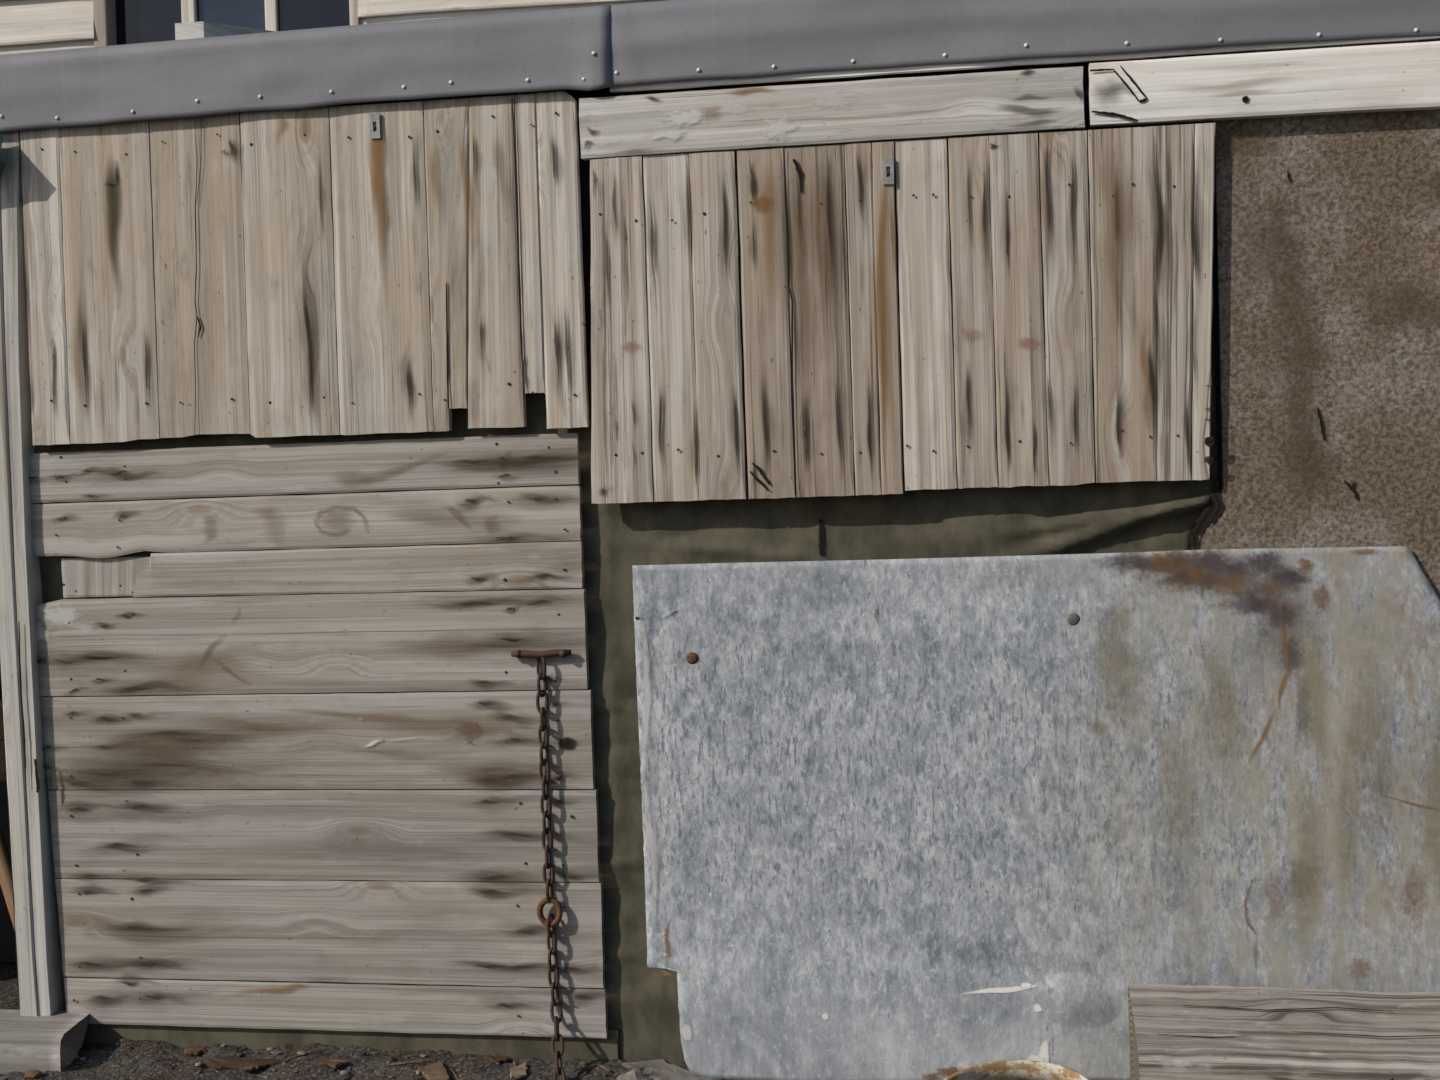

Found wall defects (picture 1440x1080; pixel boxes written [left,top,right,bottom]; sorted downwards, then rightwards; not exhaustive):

crack [194,118,202,436]
corrosion [1190,549,1312,593]
corrosion [1278,621,1299,703]